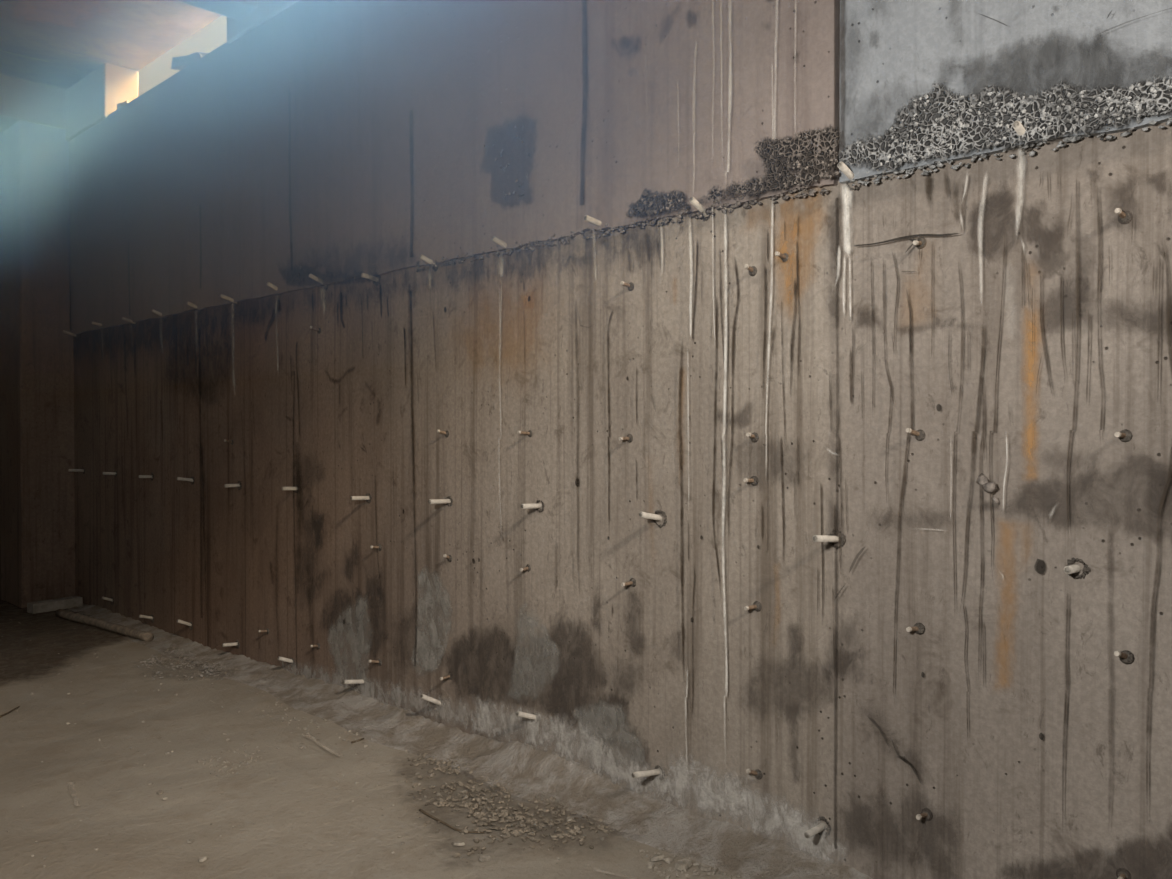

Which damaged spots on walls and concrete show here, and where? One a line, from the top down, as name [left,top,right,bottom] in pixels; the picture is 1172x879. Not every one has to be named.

leakage [837,187,913,693]
leakage [449,623,646,764]
leakage [1008,832,1172,879]